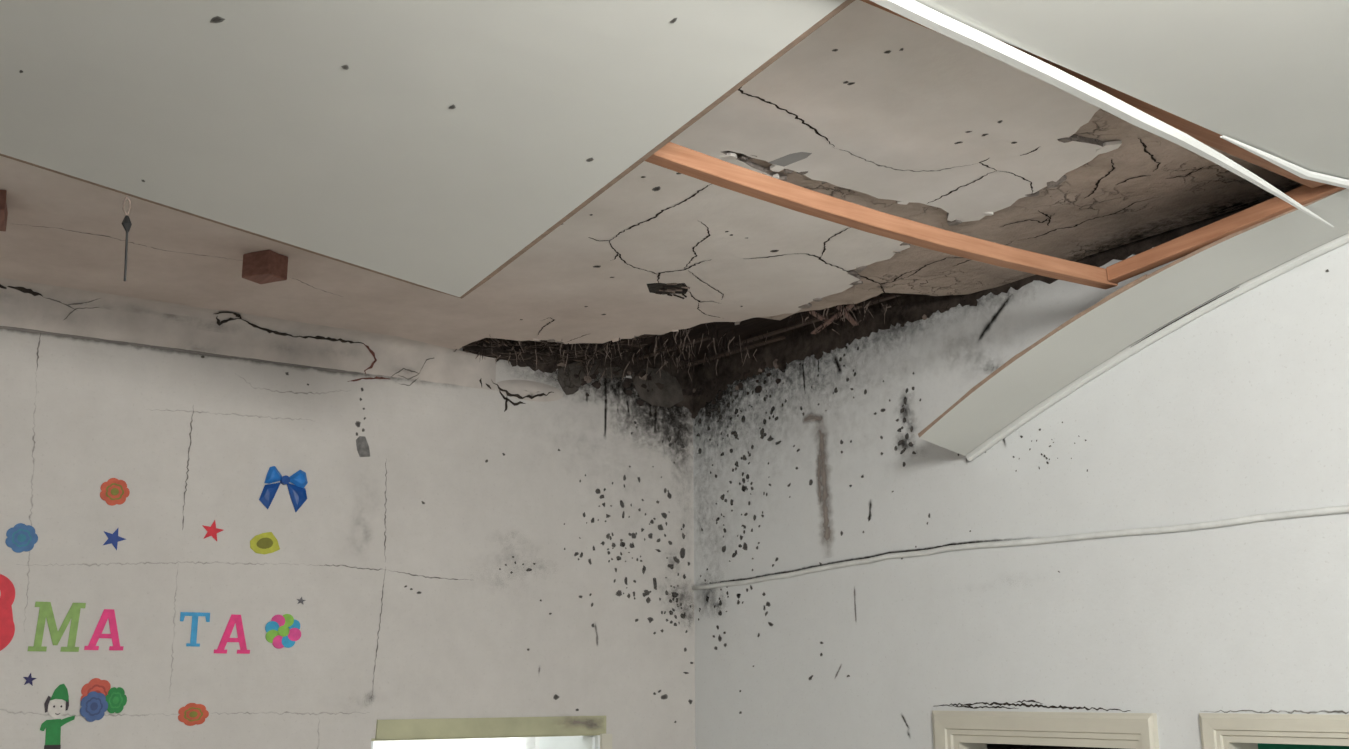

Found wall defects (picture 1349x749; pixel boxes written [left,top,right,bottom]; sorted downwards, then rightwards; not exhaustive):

crack [0,284,100,367]
crack [215,311,434,386]
crack [588,184,724,318]
spalling [463,242,1059,419]
crack [750,227,969,297]
crack [738,87,1203,245]
spalling [720,108,1303,267]
leakage [564,346,1000,674]